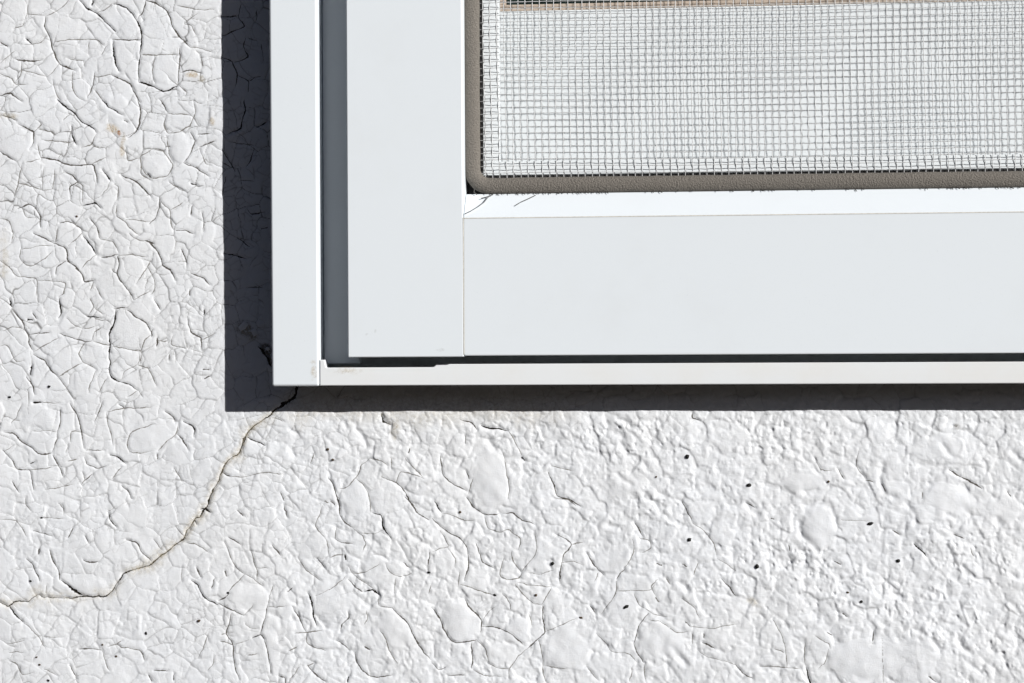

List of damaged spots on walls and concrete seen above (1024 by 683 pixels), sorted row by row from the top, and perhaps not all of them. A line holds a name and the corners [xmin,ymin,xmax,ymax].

crack [0,0,298,681]